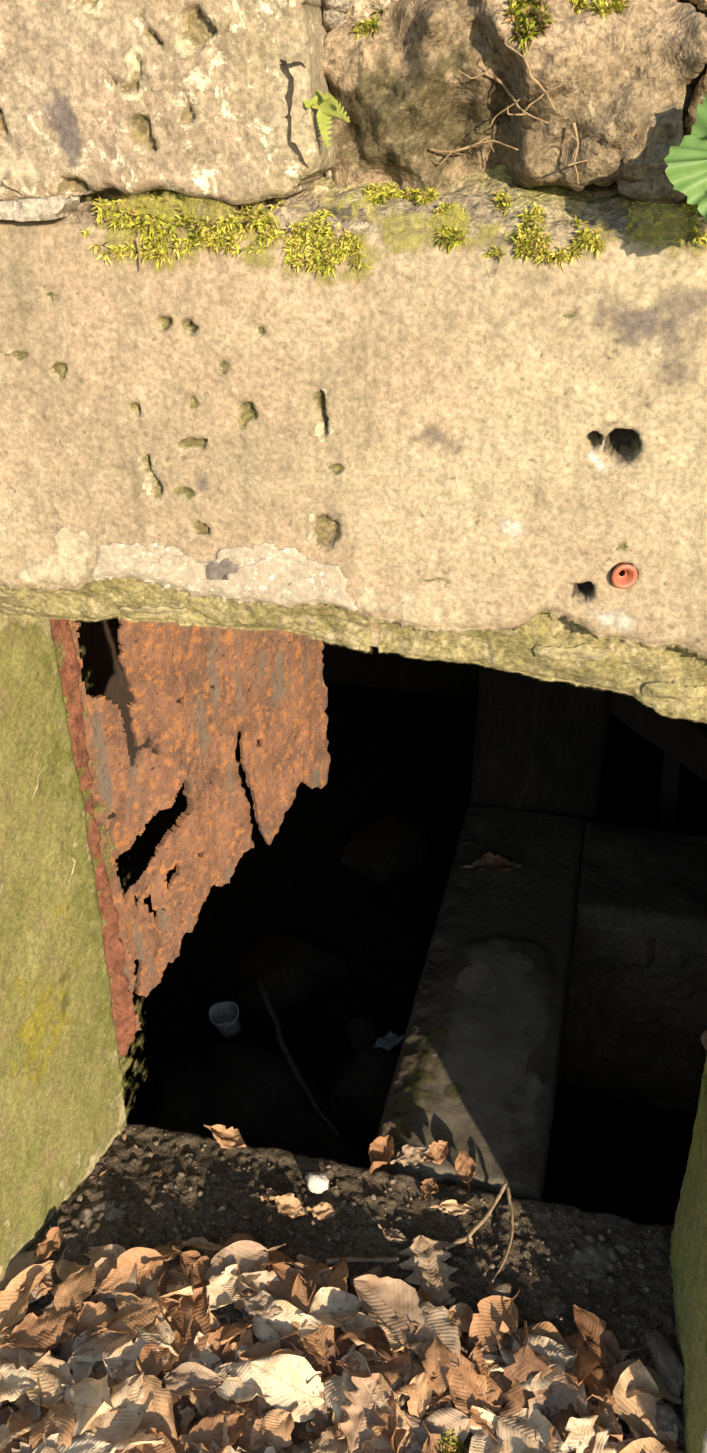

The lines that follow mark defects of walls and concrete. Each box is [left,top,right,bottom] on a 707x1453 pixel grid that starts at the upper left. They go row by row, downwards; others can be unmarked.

spalling [137,454,198,502]
spalling [0,513,707,722]
rust [49,619,331,1058]